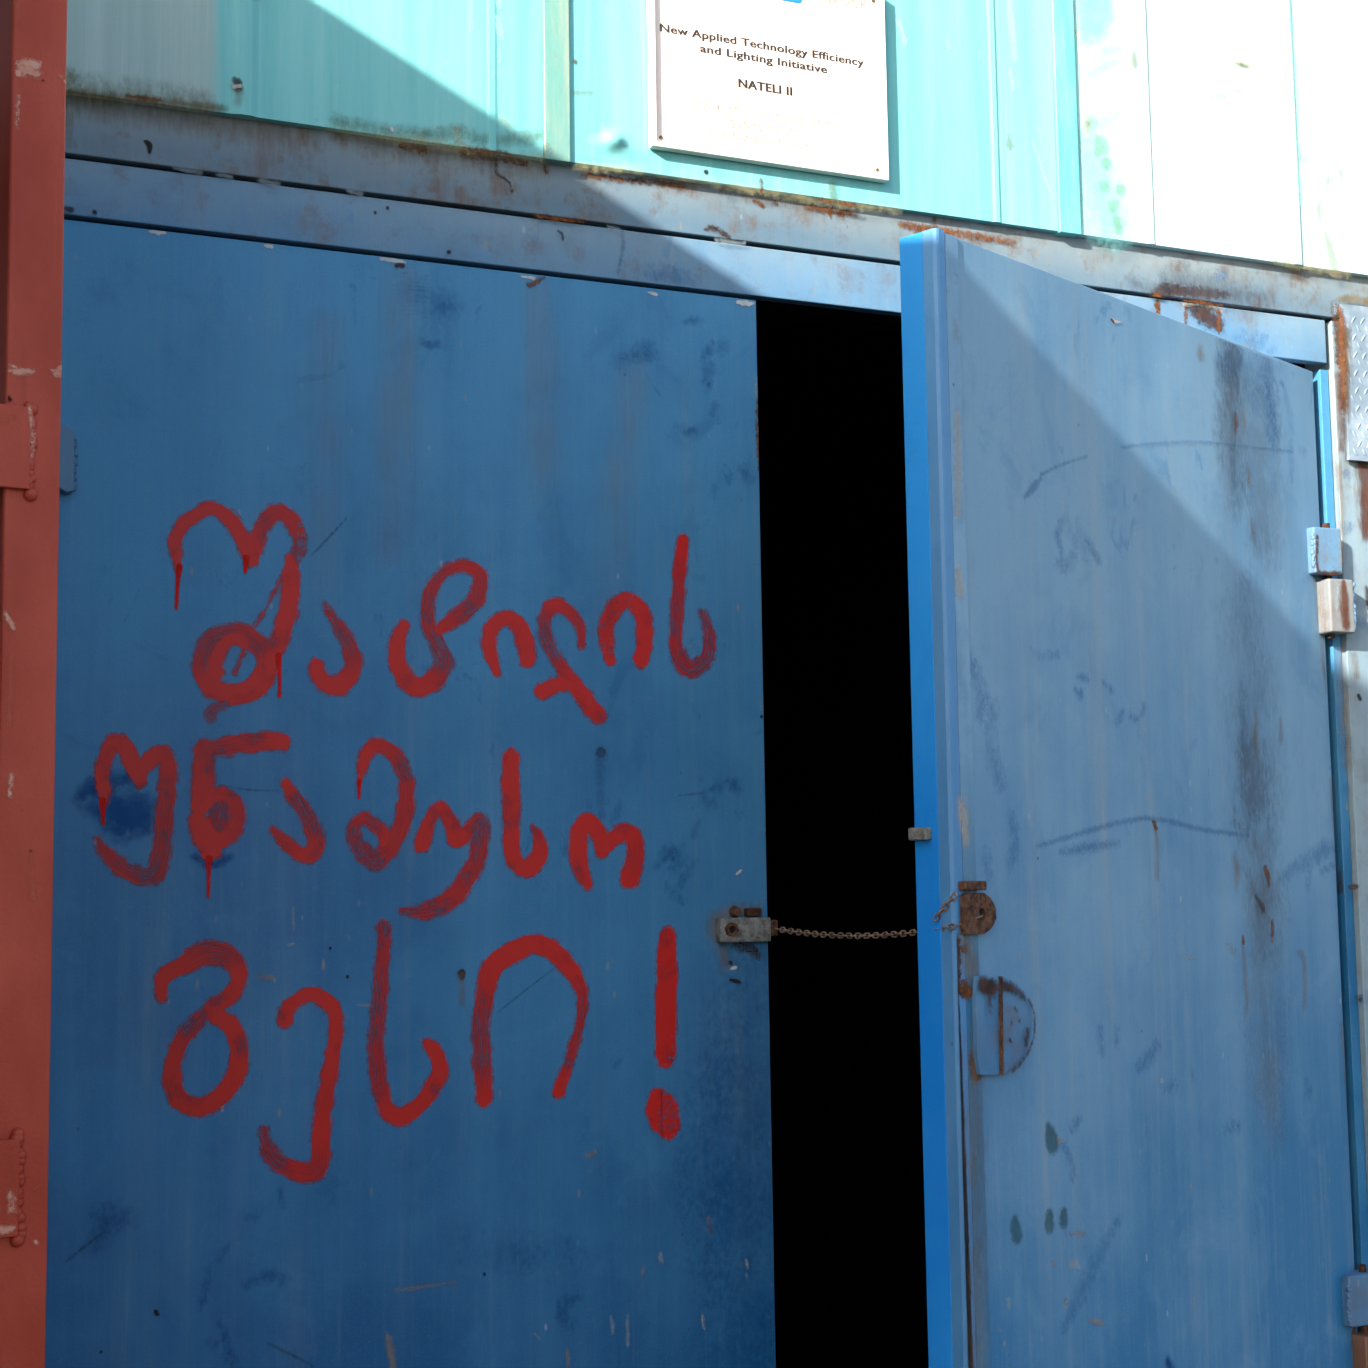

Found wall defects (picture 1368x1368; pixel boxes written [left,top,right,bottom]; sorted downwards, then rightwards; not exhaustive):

peeling [15,59,67,84]
corrosion [1149,282,1234,334]
corrosion [1331,295,1366,452]
corrosion [1358,461,1368,539]
corrosion [957,936,1036,1368]